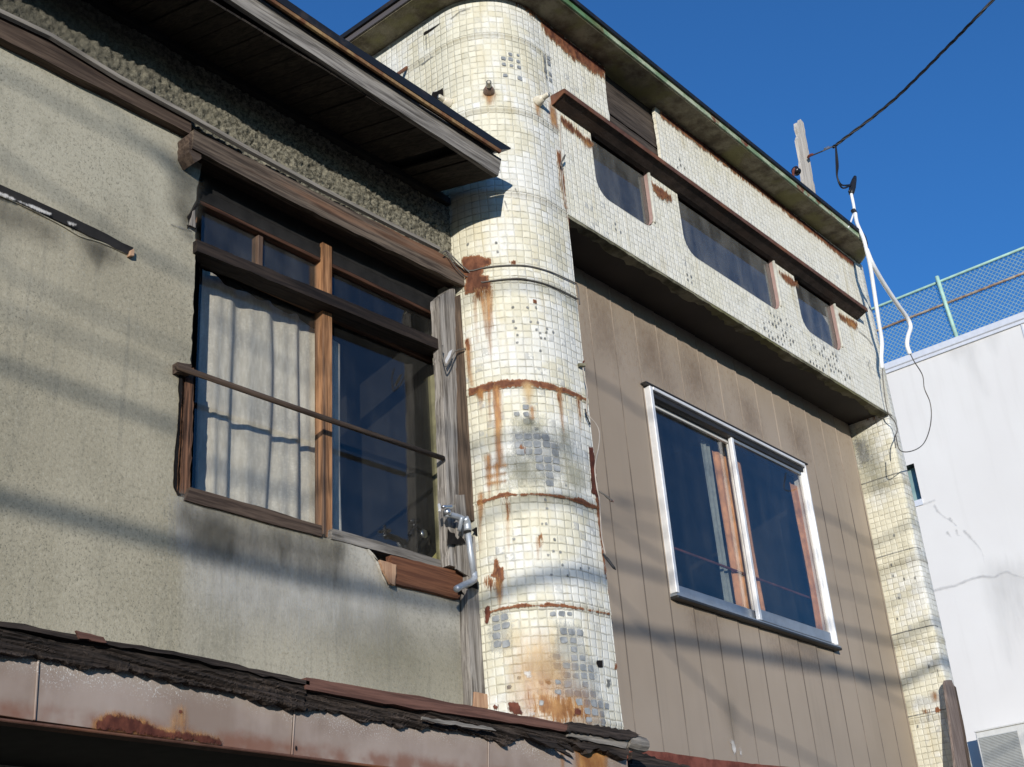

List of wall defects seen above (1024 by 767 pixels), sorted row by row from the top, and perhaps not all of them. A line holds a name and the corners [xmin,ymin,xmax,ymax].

rust [516,2,605,79]
rust [537,107,594,147]
rust [556,148,570,227]
rust [651,181,672,202]
rust [660,111,855,267]
rust [461,255,491,329]
rust [468,379,610,598]
rust [484,559,610,623]
rust [493,650,590,724]
rust [95,710,223,745]